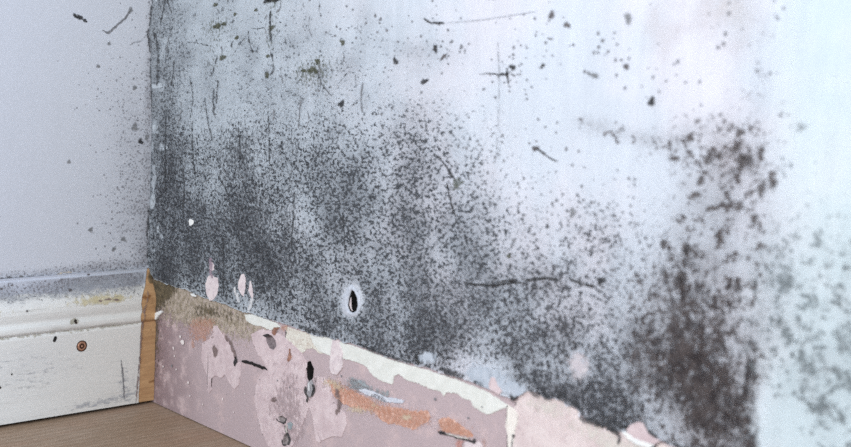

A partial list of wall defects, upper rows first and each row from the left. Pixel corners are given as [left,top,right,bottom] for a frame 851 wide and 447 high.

leakage [201,0,236,40]
leakage [228,0,313,71]
peeling [205,258,219,301]
peeling [234,274,254,313]
peeling [263,326,322,354]
peeling [347,378,405,404]
peeling [418,351,436,365]
peeling [466,364,526,397]
peeling [570,353,589,378]
spalling [276,416,293,446]
peeling [621,422,662,447]